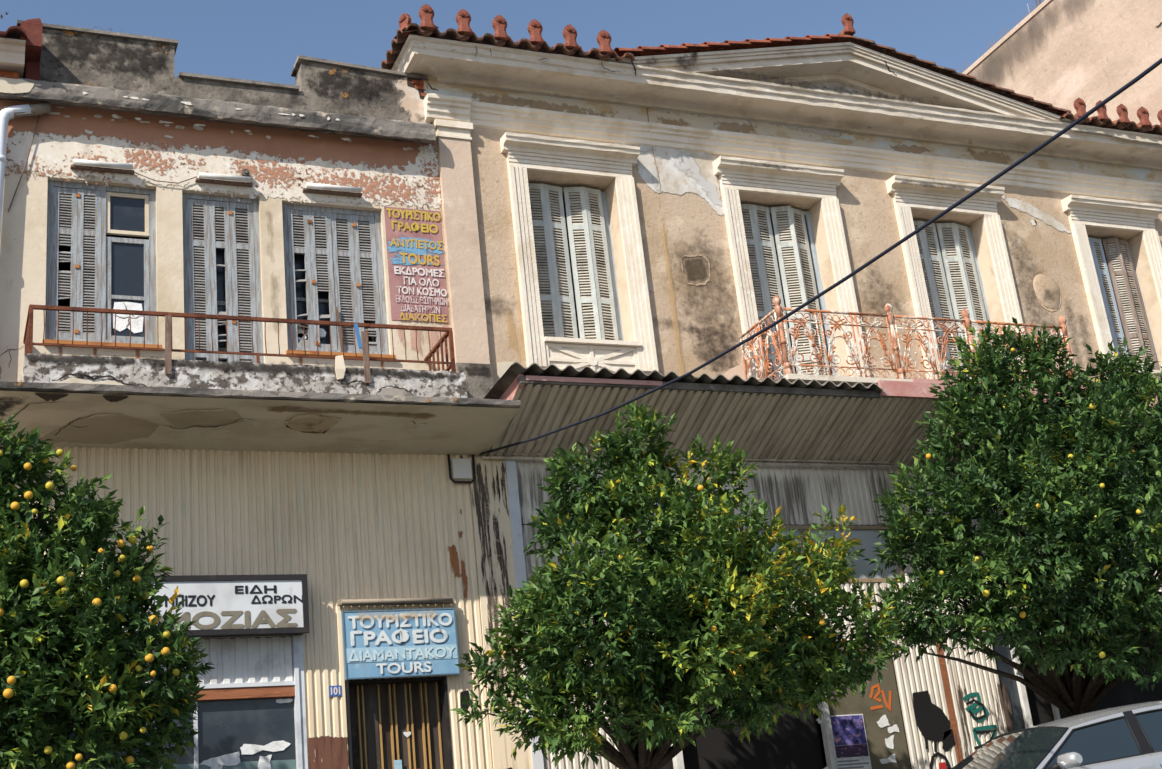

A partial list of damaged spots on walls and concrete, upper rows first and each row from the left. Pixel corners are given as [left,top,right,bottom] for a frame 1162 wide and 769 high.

water stain [43,29,169,76]
water stain [307,70,392,100]
peeling [0,77,442,213]
flaking render [613,142,725,216]
flaking render [1001,195,1071,233]
water stain [662,228,714,376]